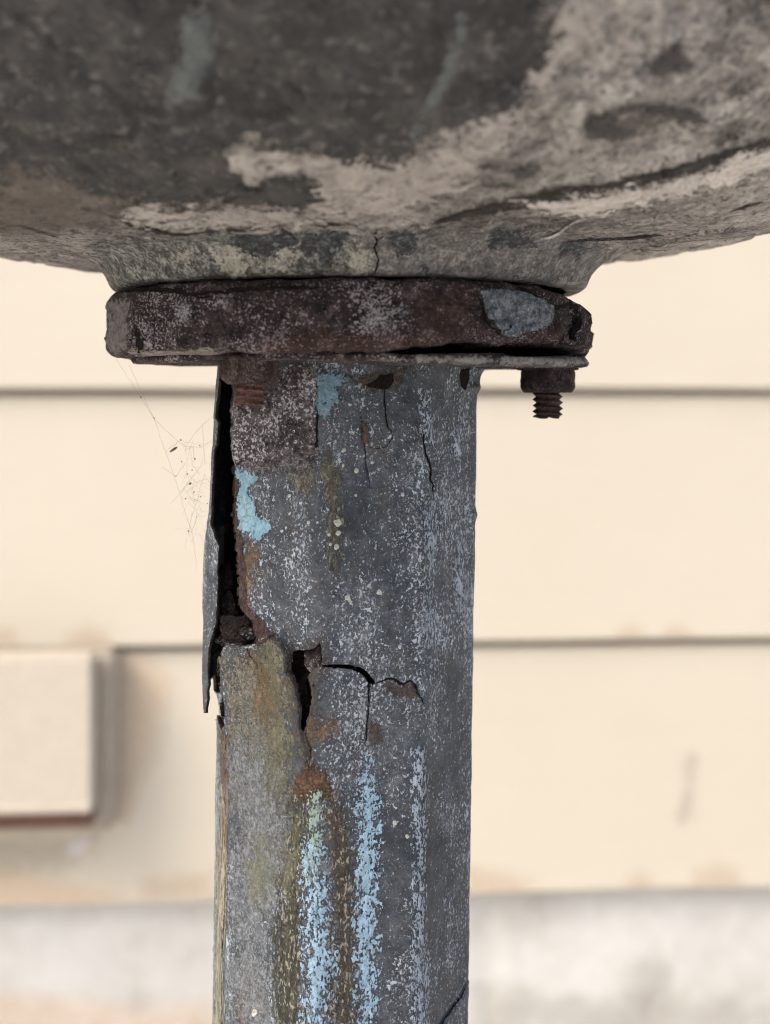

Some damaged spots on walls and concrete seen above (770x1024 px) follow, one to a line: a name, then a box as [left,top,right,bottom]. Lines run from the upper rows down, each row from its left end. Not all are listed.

leakage [0,0,614,357]
leakage [583,104,708,143]
crack [213,475,274,685]
spalling [127,346,366,713]
crack [360,374,394,485]
crack [422,434,434,491]
crack [323,664,424,746]
corrosion [217,731,231,937]